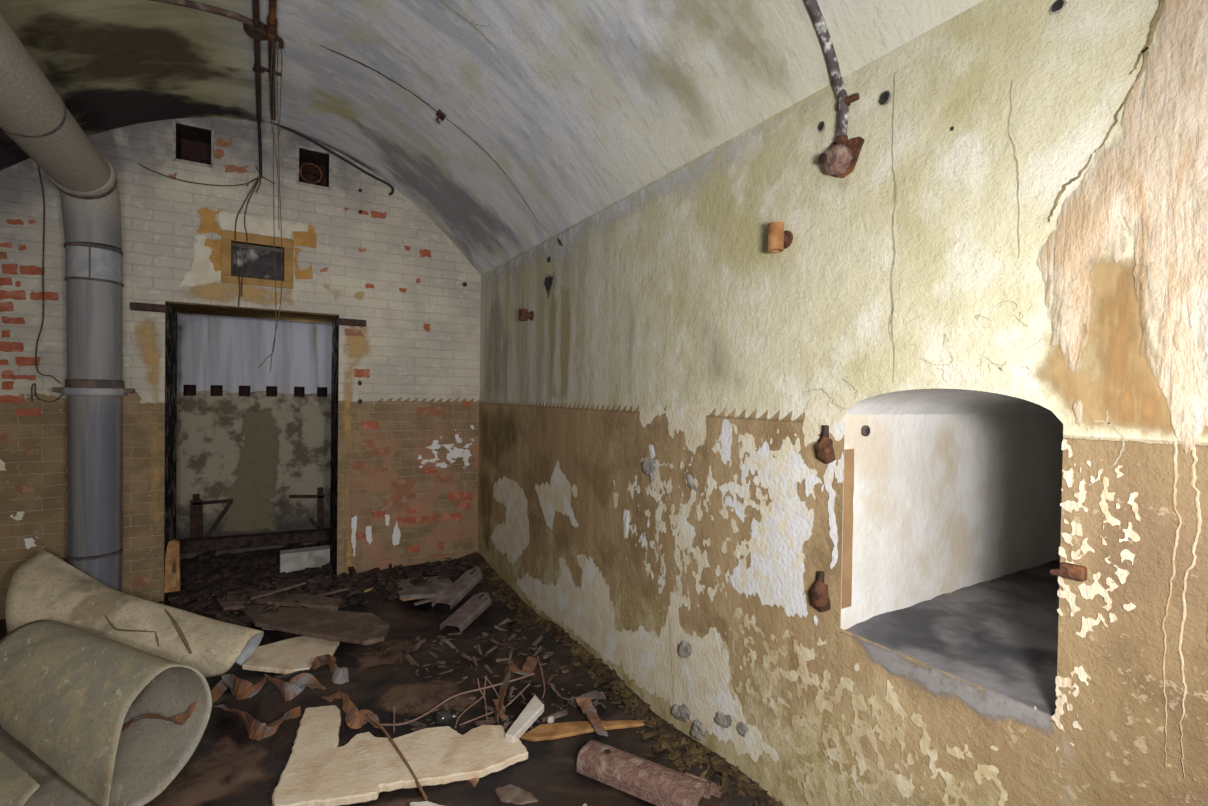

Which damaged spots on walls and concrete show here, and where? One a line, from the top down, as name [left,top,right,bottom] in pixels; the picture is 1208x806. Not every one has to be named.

peeling [196,207,222,272]
peeling [292,224,328,279]
flaking render [344,207,387,219]
flaking render [404,245,432,258]
flaking render [0,242,59,416]
damp [1037,0,1208,779]
peeling [418,425,476,475]
flaking render [351,491,473,557]
peeling [1057,439,1141,638]
peeling [490,396,1091,806]